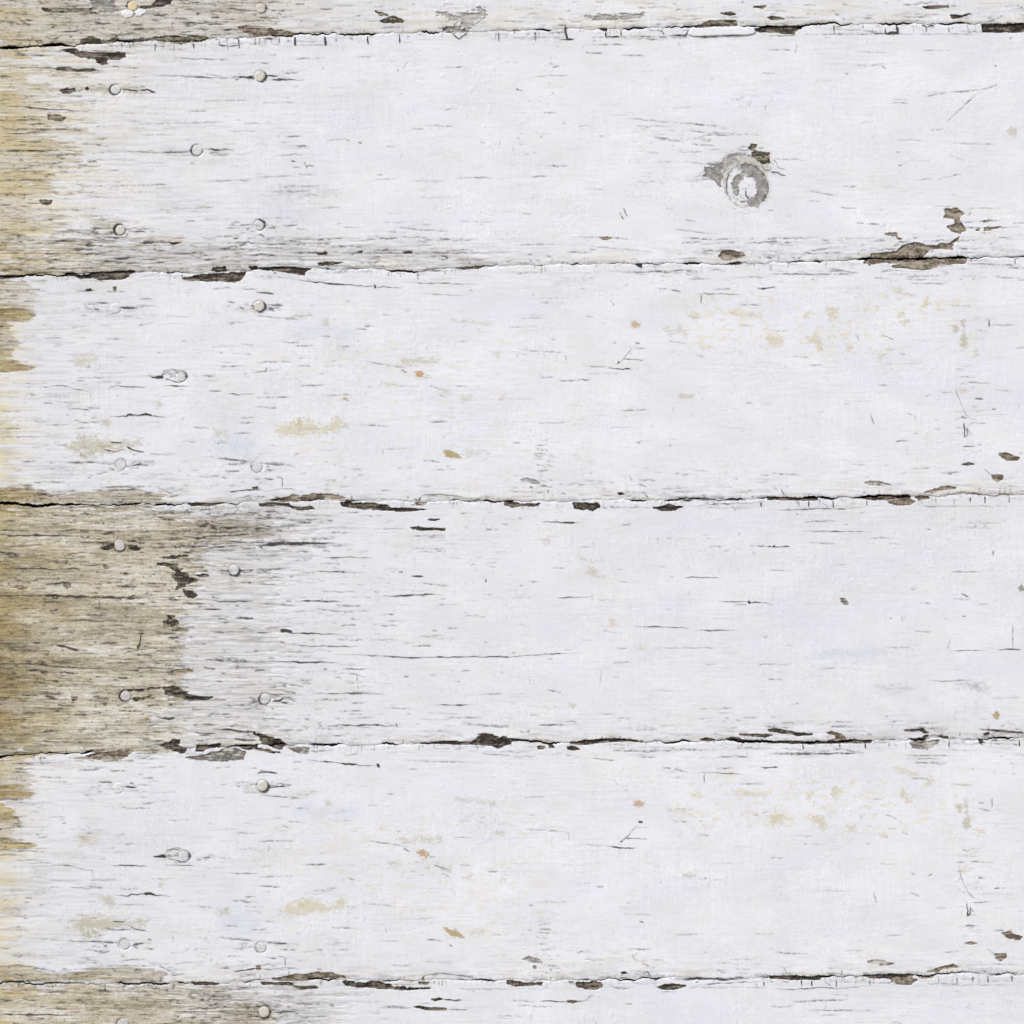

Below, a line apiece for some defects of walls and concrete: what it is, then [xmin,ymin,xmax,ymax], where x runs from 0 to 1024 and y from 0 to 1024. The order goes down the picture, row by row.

peeling [375,11,404,24]
peeling [688,5,802,36]
peeling [923,5,971,19]
peeling [981,23,1024,33]
peeling [0,0,342,372]
peeling [864,208,1001,270]
crack [683,497,732,505]
peeling [0,485,446,851]
crack [199,728,255,741]
crack [681,977,870,990]